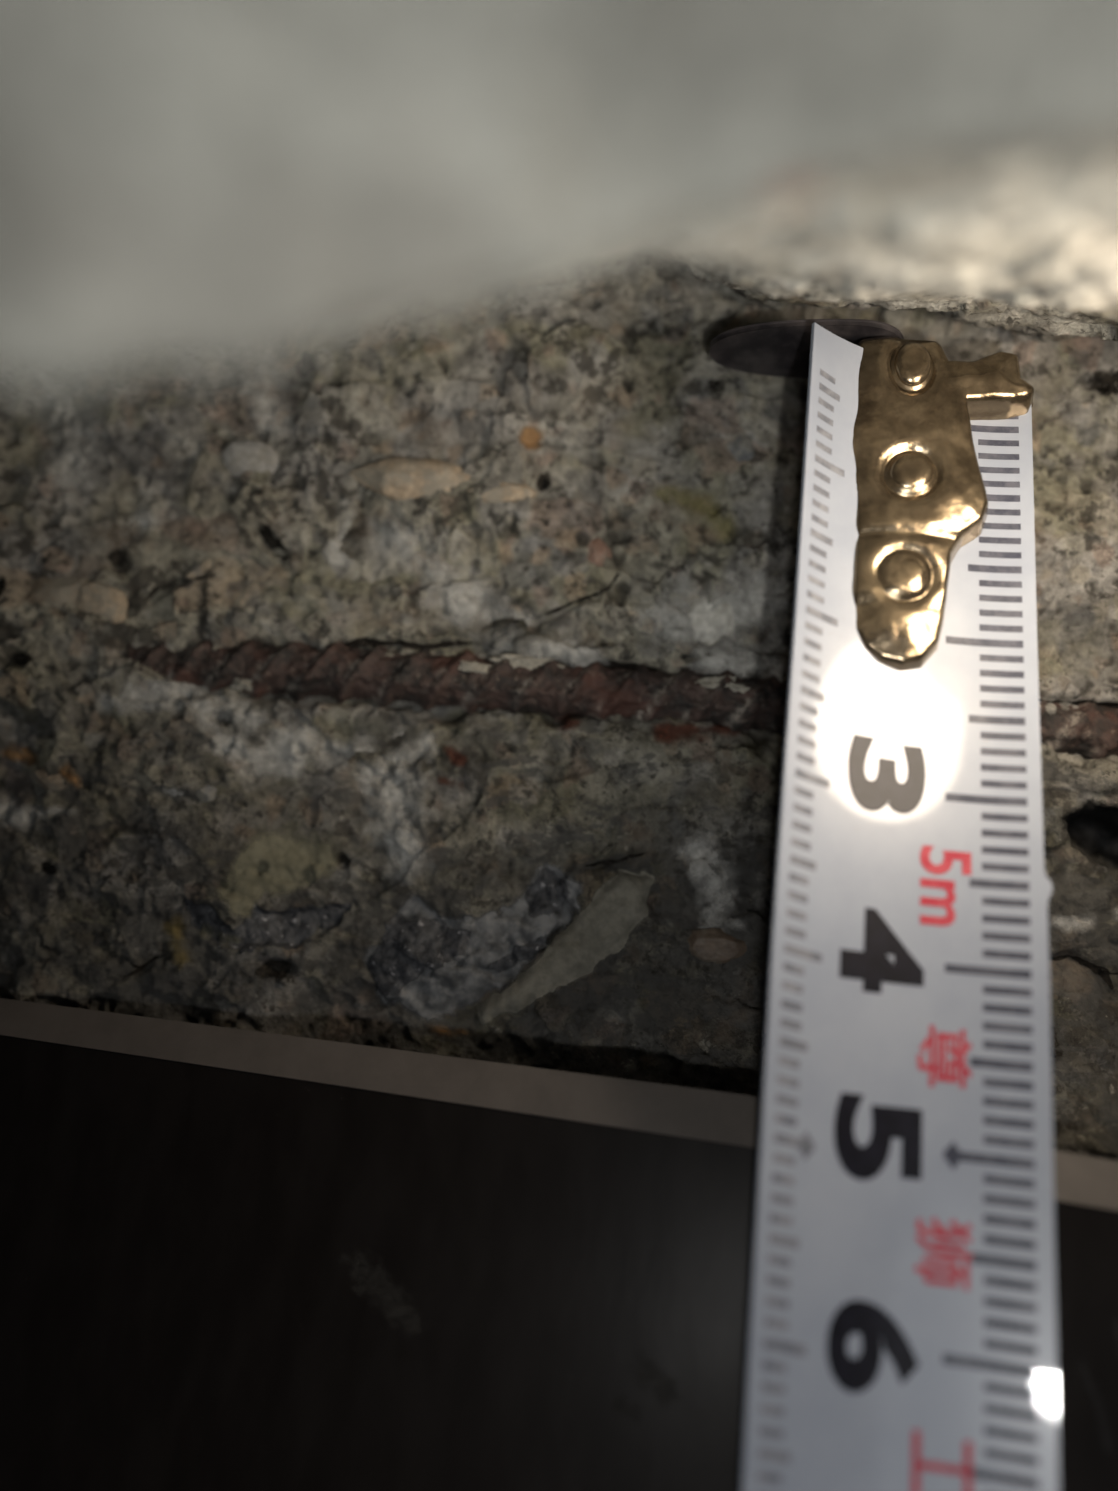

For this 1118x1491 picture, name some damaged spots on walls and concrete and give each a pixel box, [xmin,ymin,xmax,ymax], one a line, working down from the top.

spalling [0,257,1118,1098]
corrosion [653,723,740,744]
spalling [1041,743,1118,1161]